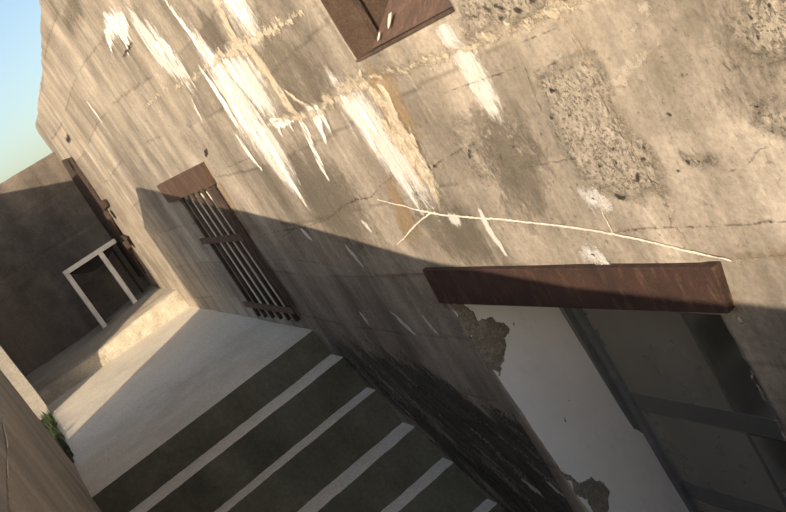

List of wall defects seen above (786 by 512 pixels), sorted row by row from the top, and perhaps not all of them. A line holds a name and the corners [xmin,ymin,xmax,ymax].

leakage [103,20,130,55]
leakage [165,0,490,262]
leakage [437,23,542,216]
spalling [458,0,546,39]
spalling [537,52,667,200]
crack [558,11,659,138]
crack [639,1,650,16]
crack [338,156,772,261]
peeling [449,304,514,376]
peeling [559,471,610,512]